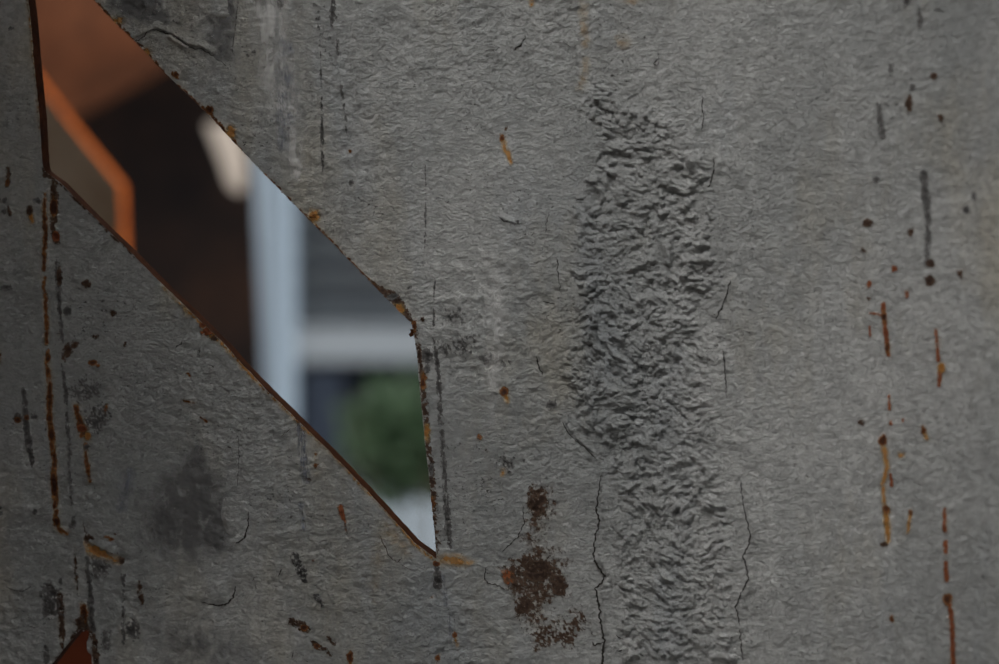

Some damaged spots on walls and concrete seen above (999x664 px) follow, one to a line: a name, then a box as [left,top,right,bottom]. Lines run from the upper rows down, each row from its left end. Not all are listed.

water stain [110,0,169,25]
corrosion [94,0,245,154]
corrosion [26,167,135,536]
corrosion [178,302,310,434]
corrosion [264,173,471,565]
corrosion [866,280,890,357]
corrosion [934,329,945,388]
corrosion [484,484,593,652]
crack [563,419,643,664]
corrosion [878,394,904,547]
corrosion [942,507,956,664]